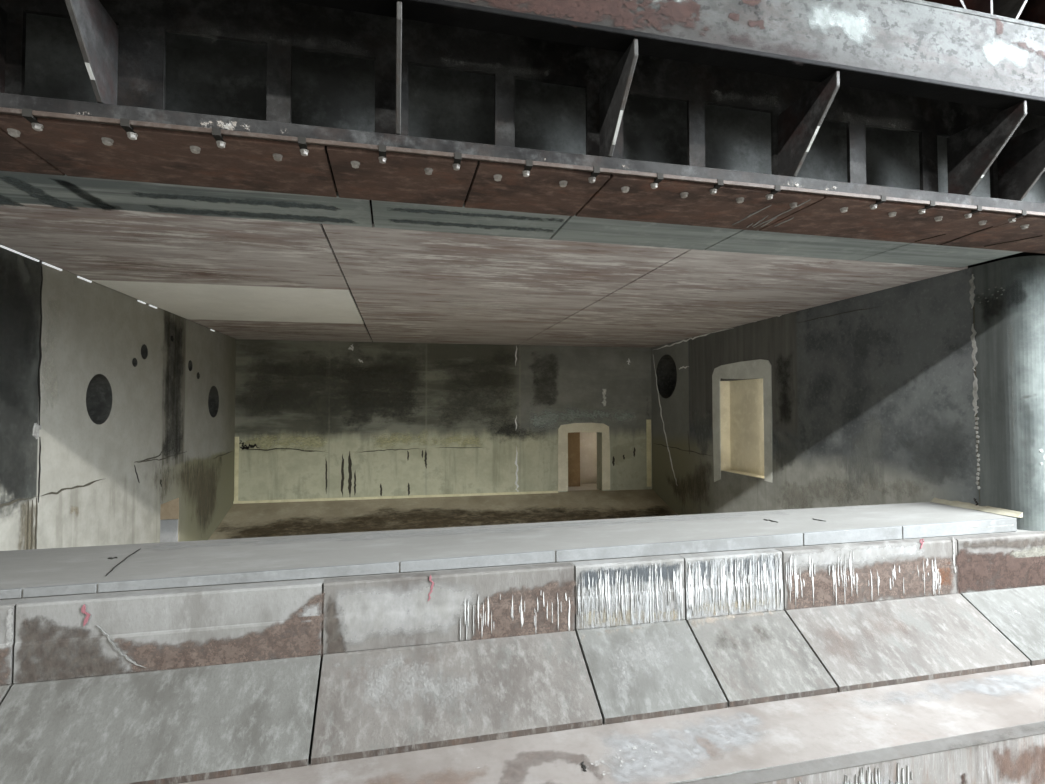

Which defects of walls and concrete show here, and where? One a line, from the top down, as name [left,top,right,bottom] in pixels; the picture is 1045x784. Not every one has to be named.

corrosion [470,0,710,36]
crack [134,451,187,487]
crack [0,479,102,508]
leakage [460,555,815,640]
corrosion [994,746,1045,784]